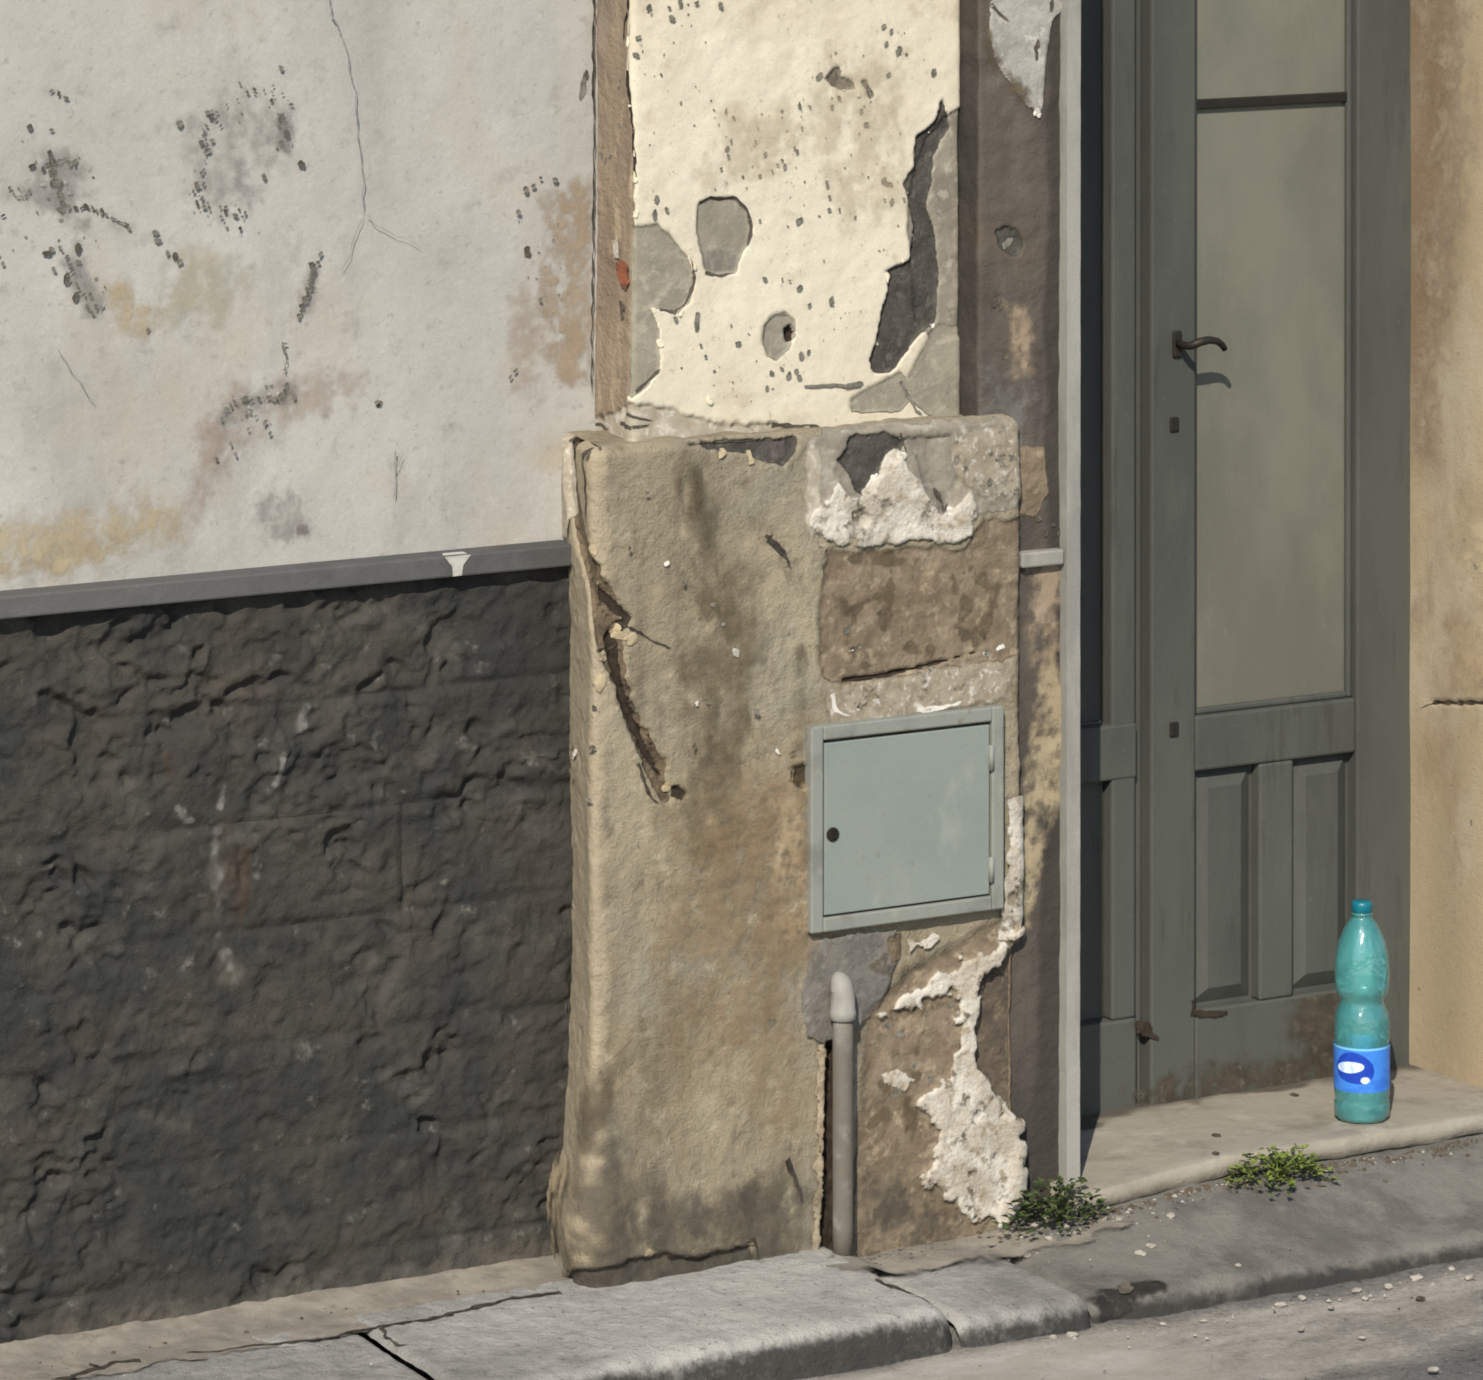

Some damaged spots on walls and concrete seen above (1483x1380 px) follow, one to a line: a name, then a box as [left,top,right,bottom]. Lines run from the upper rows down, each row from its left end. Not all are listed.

flaking render [986,0,1062,118]
flaking render [561,0,1023,684]
crack [572,435,686,803]
crack [1422,700,1483,708]
flaking render [853,795,1028,1257]
flaking render [785,1040,833,1250]
flaking render [568,1238,759,1287]